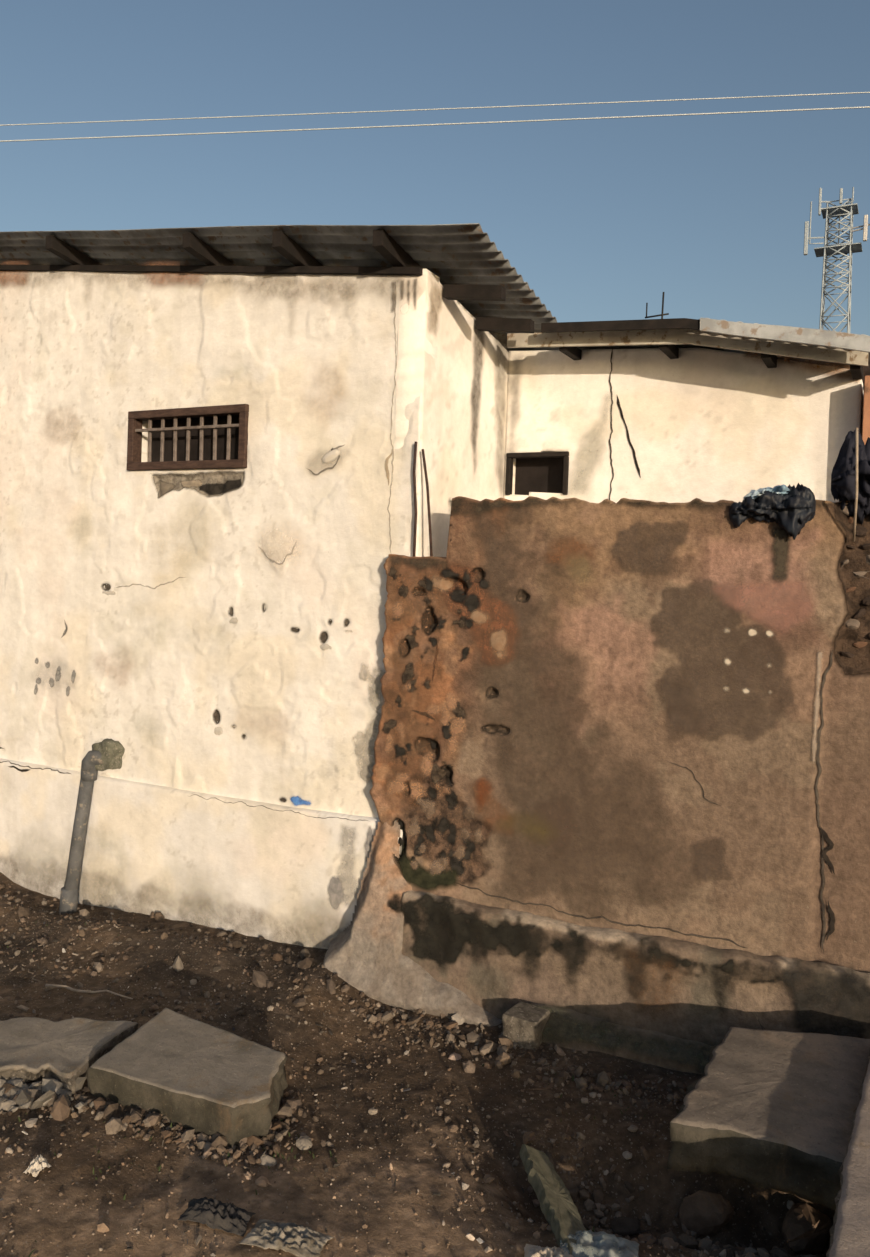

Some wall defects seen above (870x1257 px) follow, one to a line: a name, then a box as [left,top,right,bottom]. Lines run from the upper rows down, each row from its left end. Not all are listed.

flaking render [153,471,244,498]
crack [385,282,397,552]
leakage [472,329,502,449]
crack [609,349,641,500]
crack [0,747,71,774]
flaking render [355,564,530,884]
leakage [449,498,731,906]
leakage [651,580,794,739]
crack [812,651,835,953]
spalling [833,501,870,676]
leakage [388,845,592,975]
leakage [611,937,870,1038]